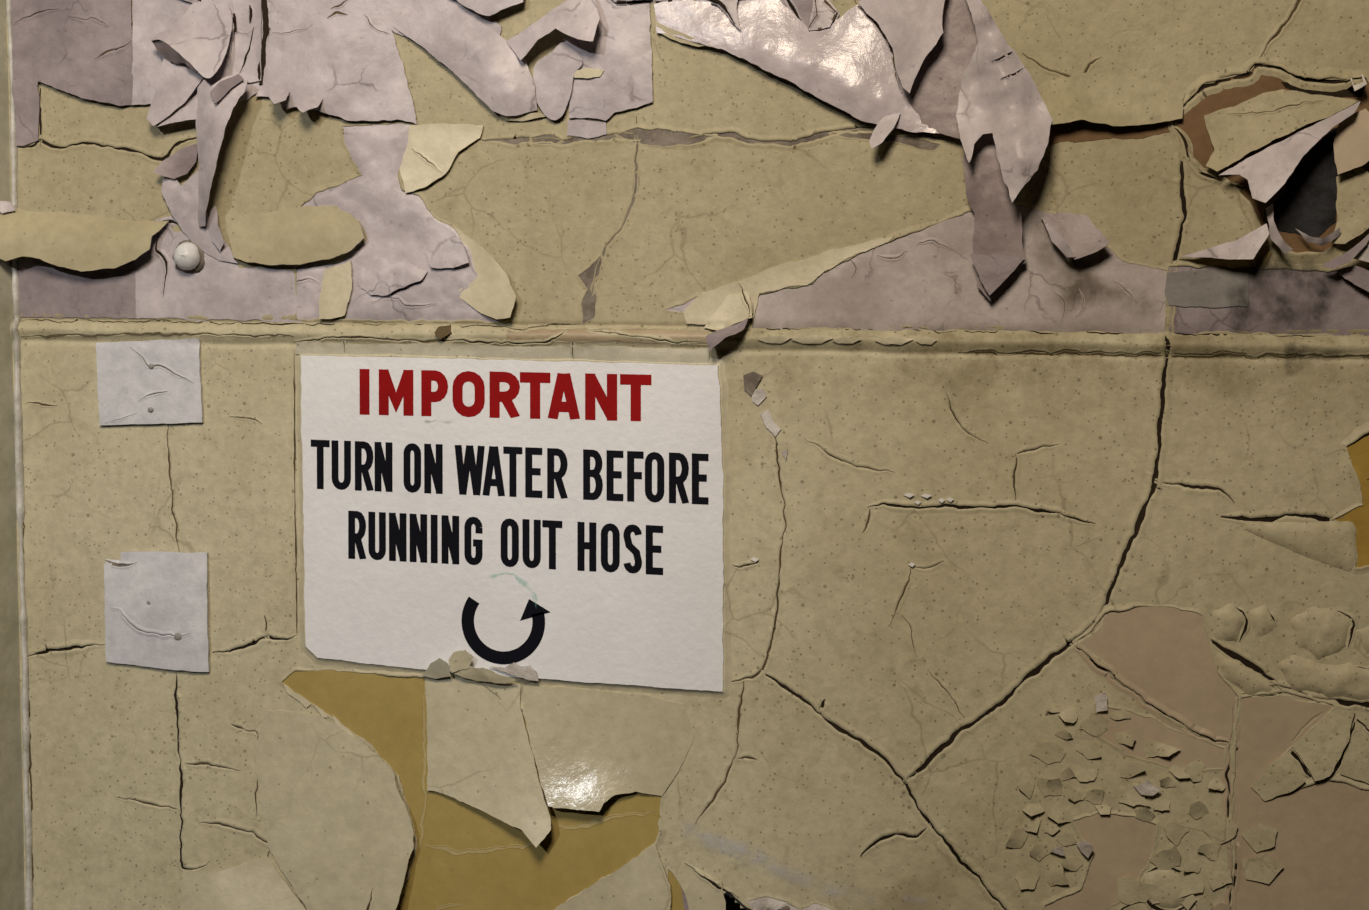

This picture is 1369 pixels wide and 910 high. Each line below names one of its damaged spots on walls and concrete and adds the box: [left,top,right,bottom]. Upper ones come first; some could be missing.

crack [1259,0,1306,58]
peeling [0,0,1369,363]
crack [1166,142,1194,272]
peeling [743,372,788,460]
peeling [904,493,953,505]
peeling [1329,421,1369,575]
crack [18,317,518,910]
crack [694,305,1369,910]
peeling [181,650,695,910]
spalling [665,862,837,910]